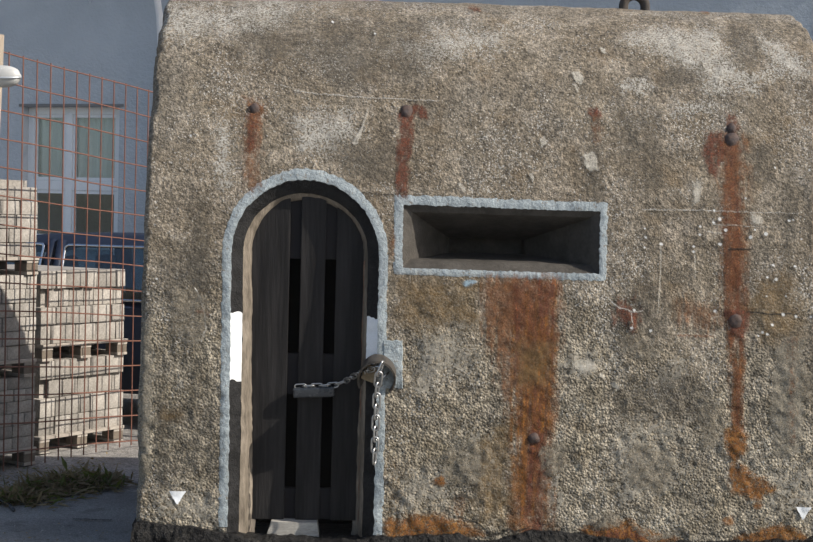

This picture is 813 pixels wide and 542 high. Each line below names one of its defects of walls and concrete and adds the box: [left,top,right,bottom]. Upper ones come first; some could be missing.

corrosion [247,101,263,192]
corrosion [396,105,427,199]
corrosion [678,115,774,509]
corrosion [384,515,484,537]
crack [458,497,528,536]
corrosion [580,518,676,542]
corrosion [734,526,807,542]